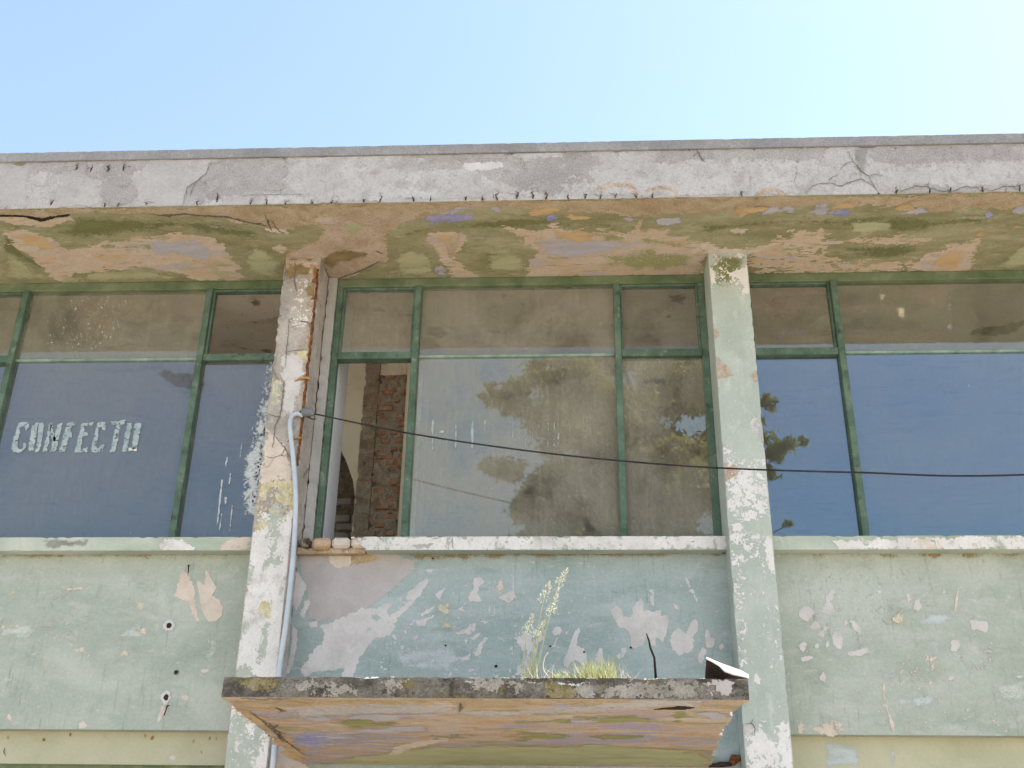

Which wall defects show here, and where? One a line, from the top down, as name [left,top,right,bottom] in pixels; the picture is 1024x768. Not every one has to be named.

crack [150,163,302,233]
crack [794,154,1024,194]
spalling [0,152,1024,687]
spalling [225,446,783,768]